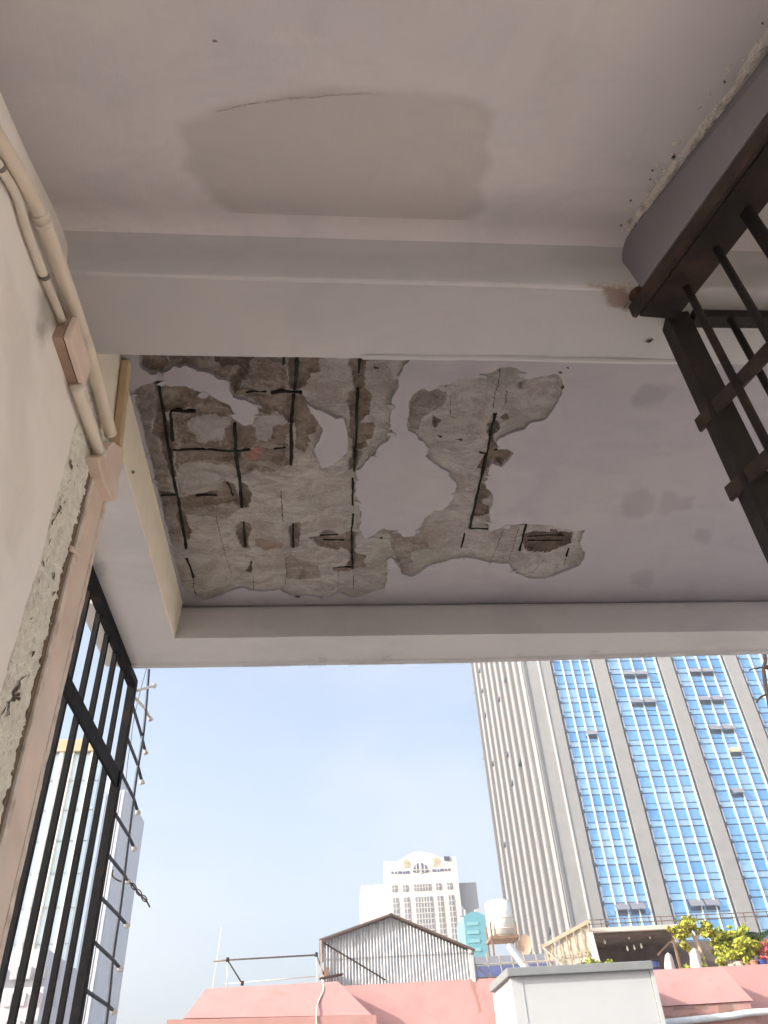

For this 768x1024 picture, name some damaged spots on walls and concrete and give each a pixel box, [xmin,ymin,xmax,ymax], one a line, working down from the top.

peeling [620,15,768,231]
spalling [130,355,584,601]